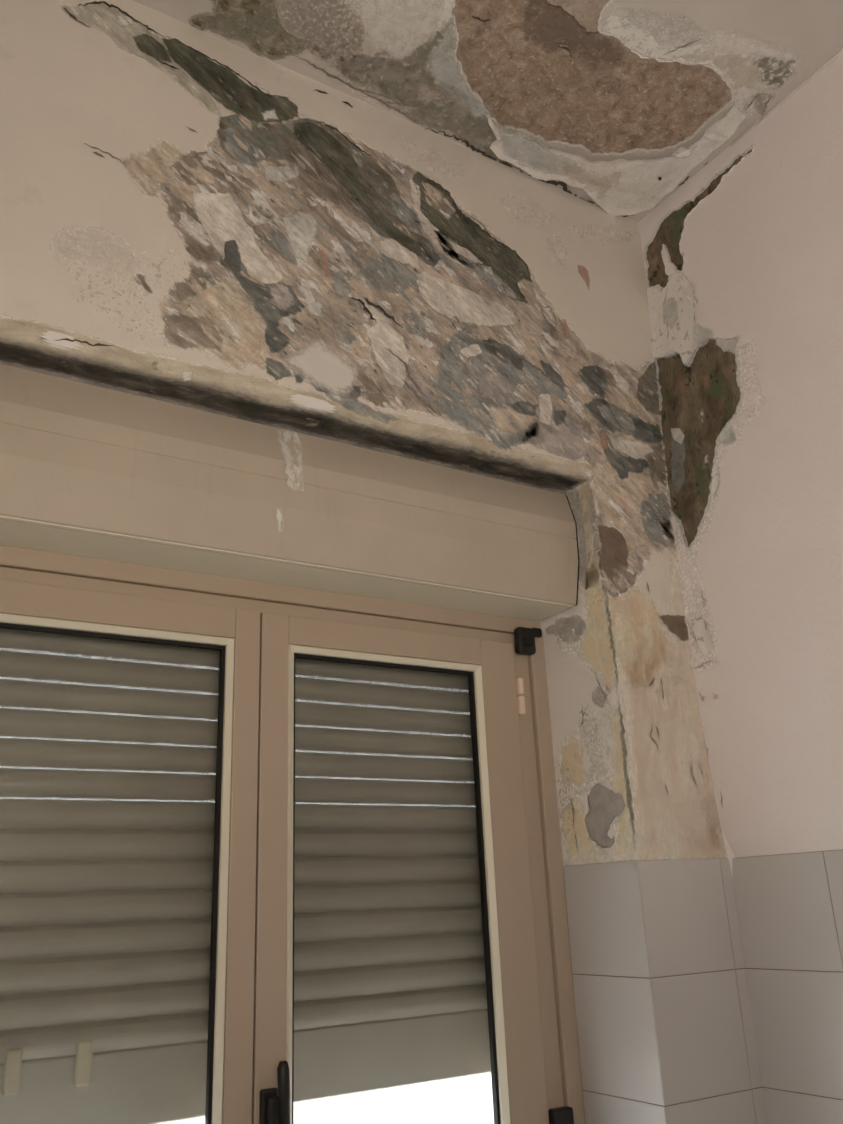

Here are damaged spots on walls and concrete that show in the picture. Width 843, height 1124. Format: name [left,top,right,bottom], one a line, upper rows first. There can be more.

damp [241,203,417,297]
peeling [62,0,795,597]
damp [0,240,721,860]
spalling [659,615,689,641]
spalling [559,705,626,851]